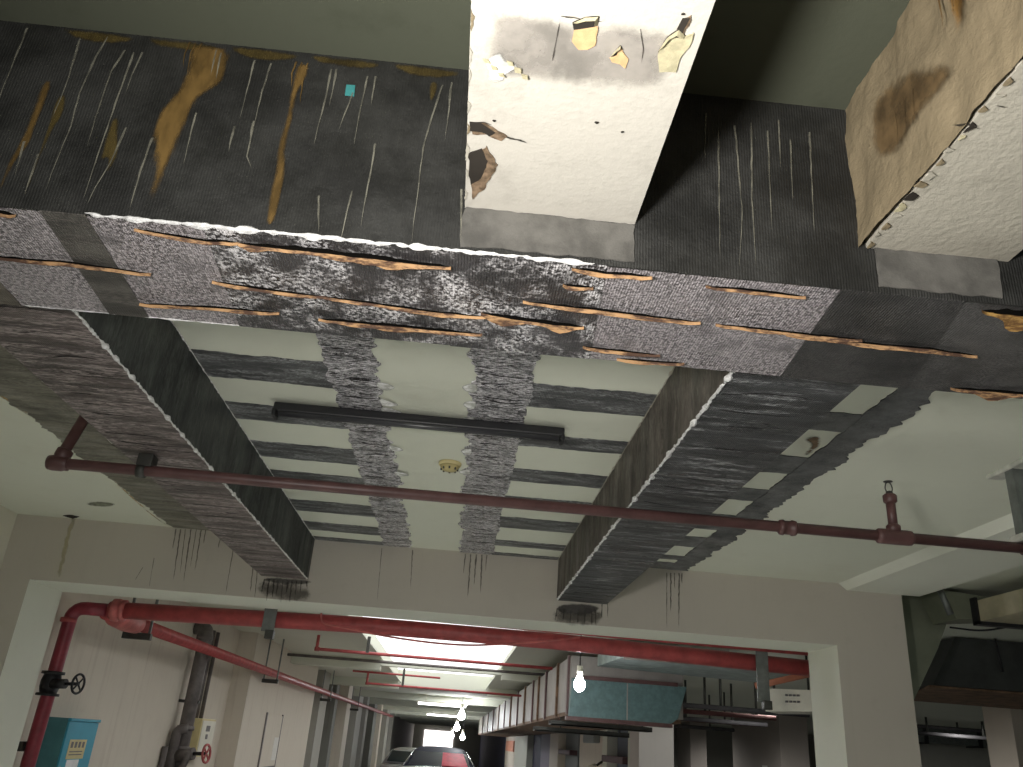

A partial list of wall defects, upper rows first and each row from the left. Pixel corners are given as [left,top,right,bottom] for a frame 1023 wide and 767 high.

damp [48,31,143,200]
rust [155,42,226,185]
damp [235,48,294,166]
damp [314,57,376,143]
damp [398,66,456,236]
spalling [464,101,507,199]
peeling [483,54,528,81]
peeling [572,16,599,50]
peeling [610,46,628,68]
peeling [658,13,694,73]
damp [734,125,756,263]
damp [767,120,793,224]